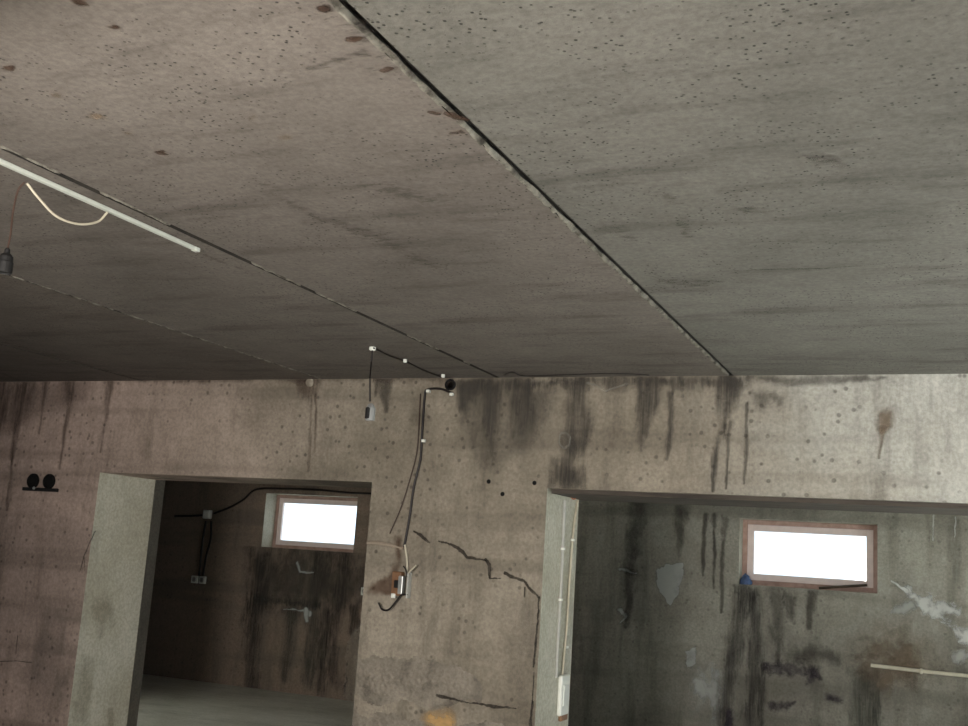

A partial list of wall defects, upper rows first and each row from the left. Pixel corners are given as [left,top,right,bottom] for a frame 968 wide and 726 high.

leakage [459,376,780,492]
leakage [249,549,396,653]
crack [413,531,540,726]
leakage [702,513,723,584]
leakage [719,587,822,726]
leakage [858,640,919,726]